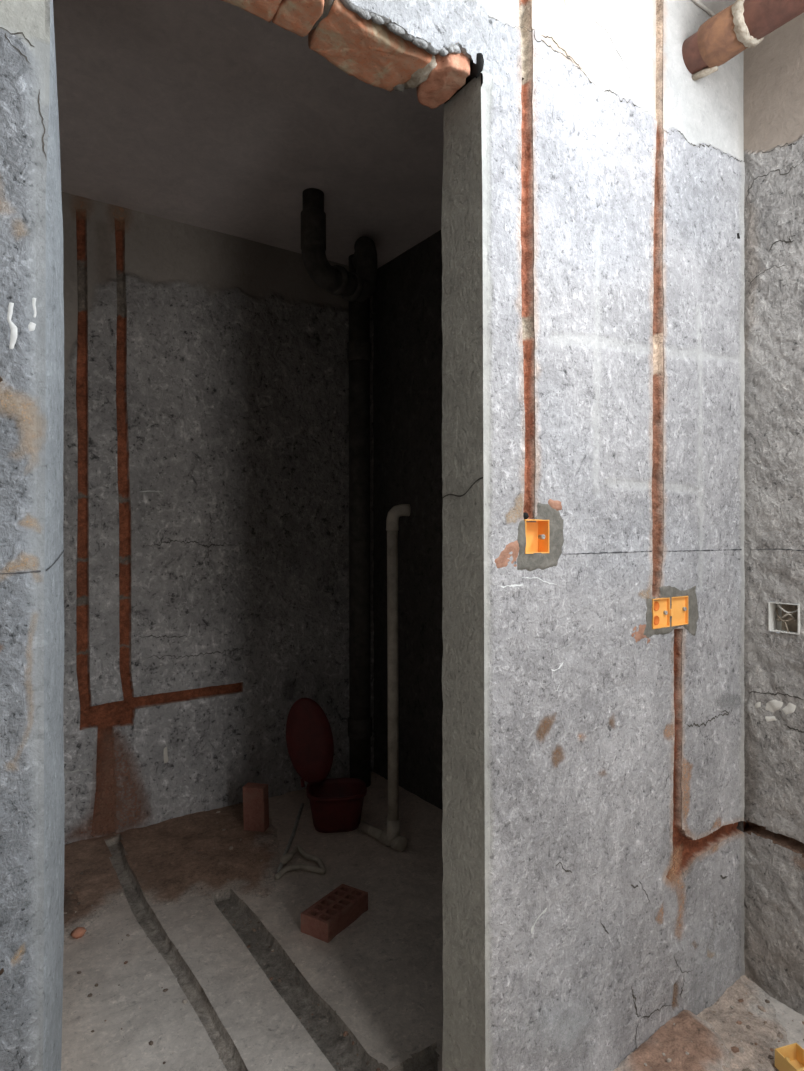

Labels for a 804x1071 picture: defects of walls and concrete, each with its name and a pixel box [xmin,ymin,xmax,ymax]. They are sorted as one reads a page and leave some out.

flaking render [340,0,484,79]
crack [631,955,693,1040]